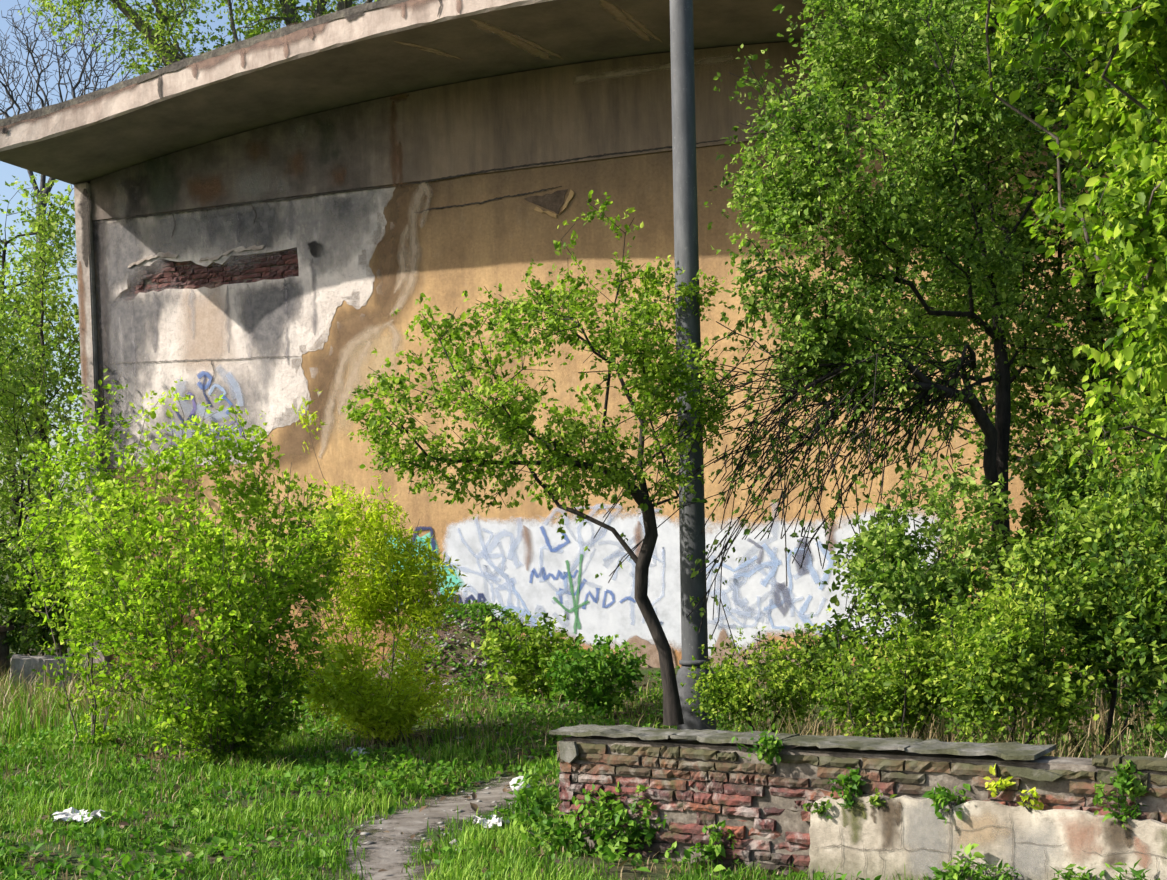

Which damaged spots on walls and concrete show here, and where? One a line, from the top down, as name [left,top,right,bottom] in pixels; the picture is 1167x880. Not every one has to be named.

damp [104,174,374,458]
peeling [104,187,396,468]
damp [276,181,430,463]
spalling [524,189,575,218]